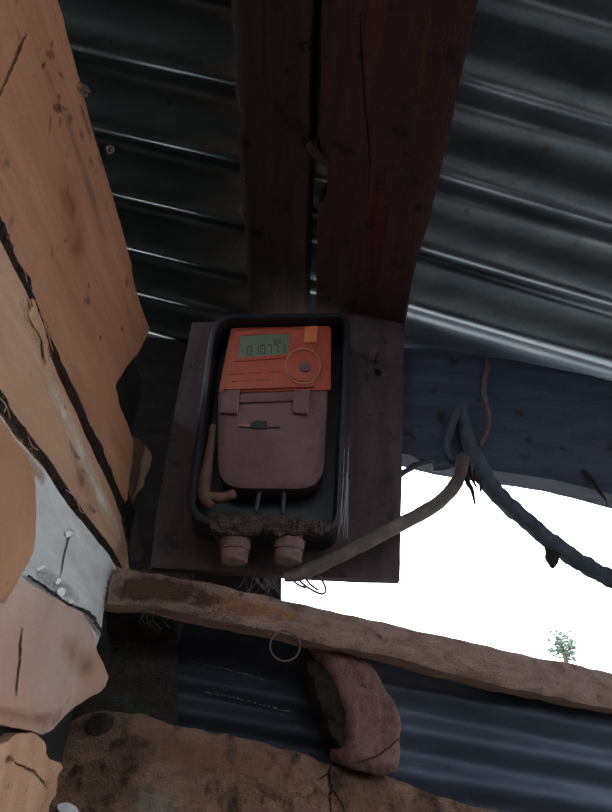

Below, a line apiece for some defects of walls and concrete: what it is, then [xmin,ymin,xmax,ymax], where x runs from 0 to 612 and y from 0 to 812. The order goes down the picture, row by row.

crack [0,34,27,96]
crack [359,10,371,197]
crack [15,628,23,696]
crack [316,738,399,812]